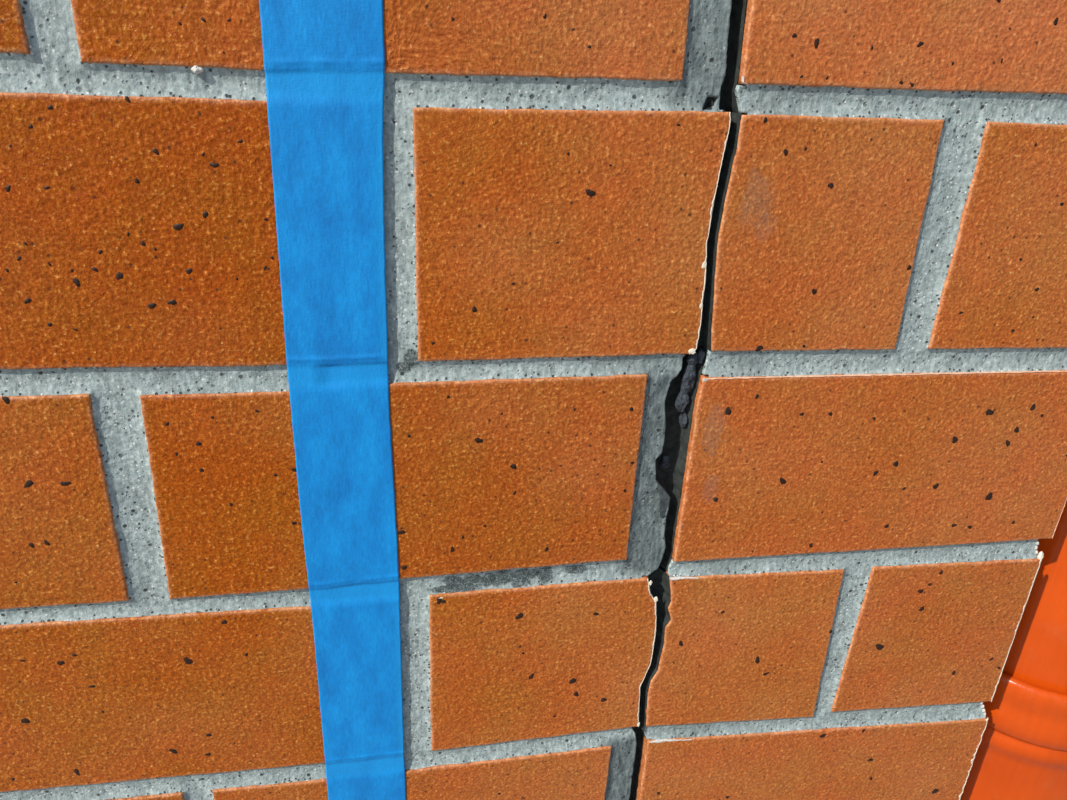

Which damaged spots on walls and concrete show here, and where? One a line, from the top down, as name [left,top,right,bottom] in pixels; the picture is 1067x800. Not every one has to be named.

crack [629,0,746,800]